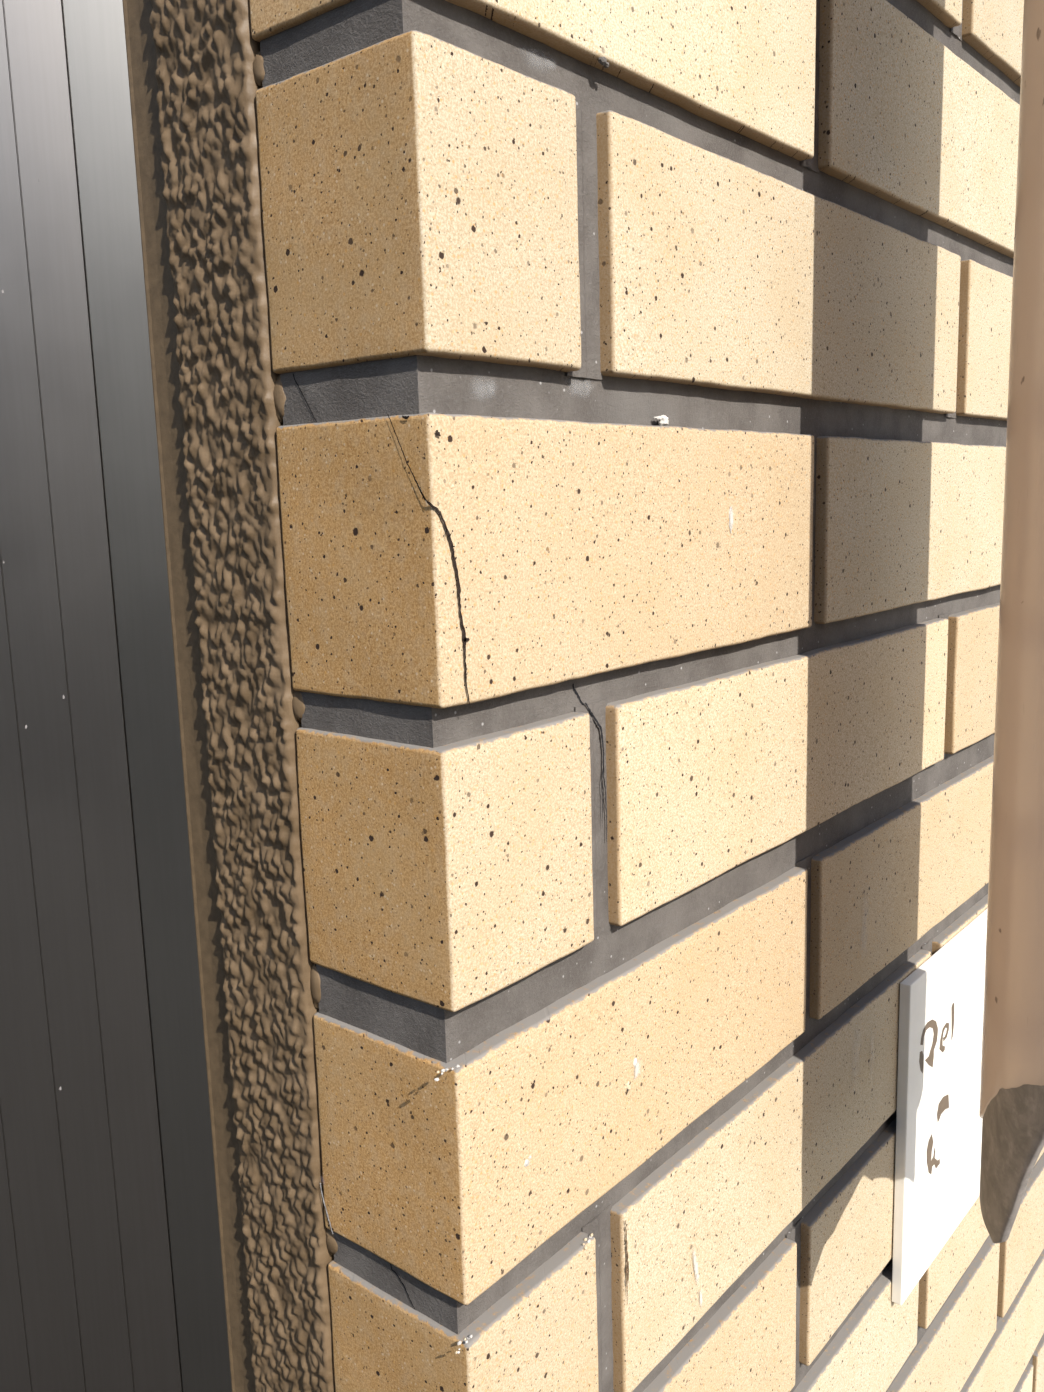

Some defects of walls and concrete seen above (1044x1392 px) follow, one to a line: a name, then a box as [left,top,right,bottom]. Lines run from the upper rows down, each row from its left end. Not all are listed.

crack [293,374,317,422]
crack [388,415,470,705]
crack [572,684,607,842]